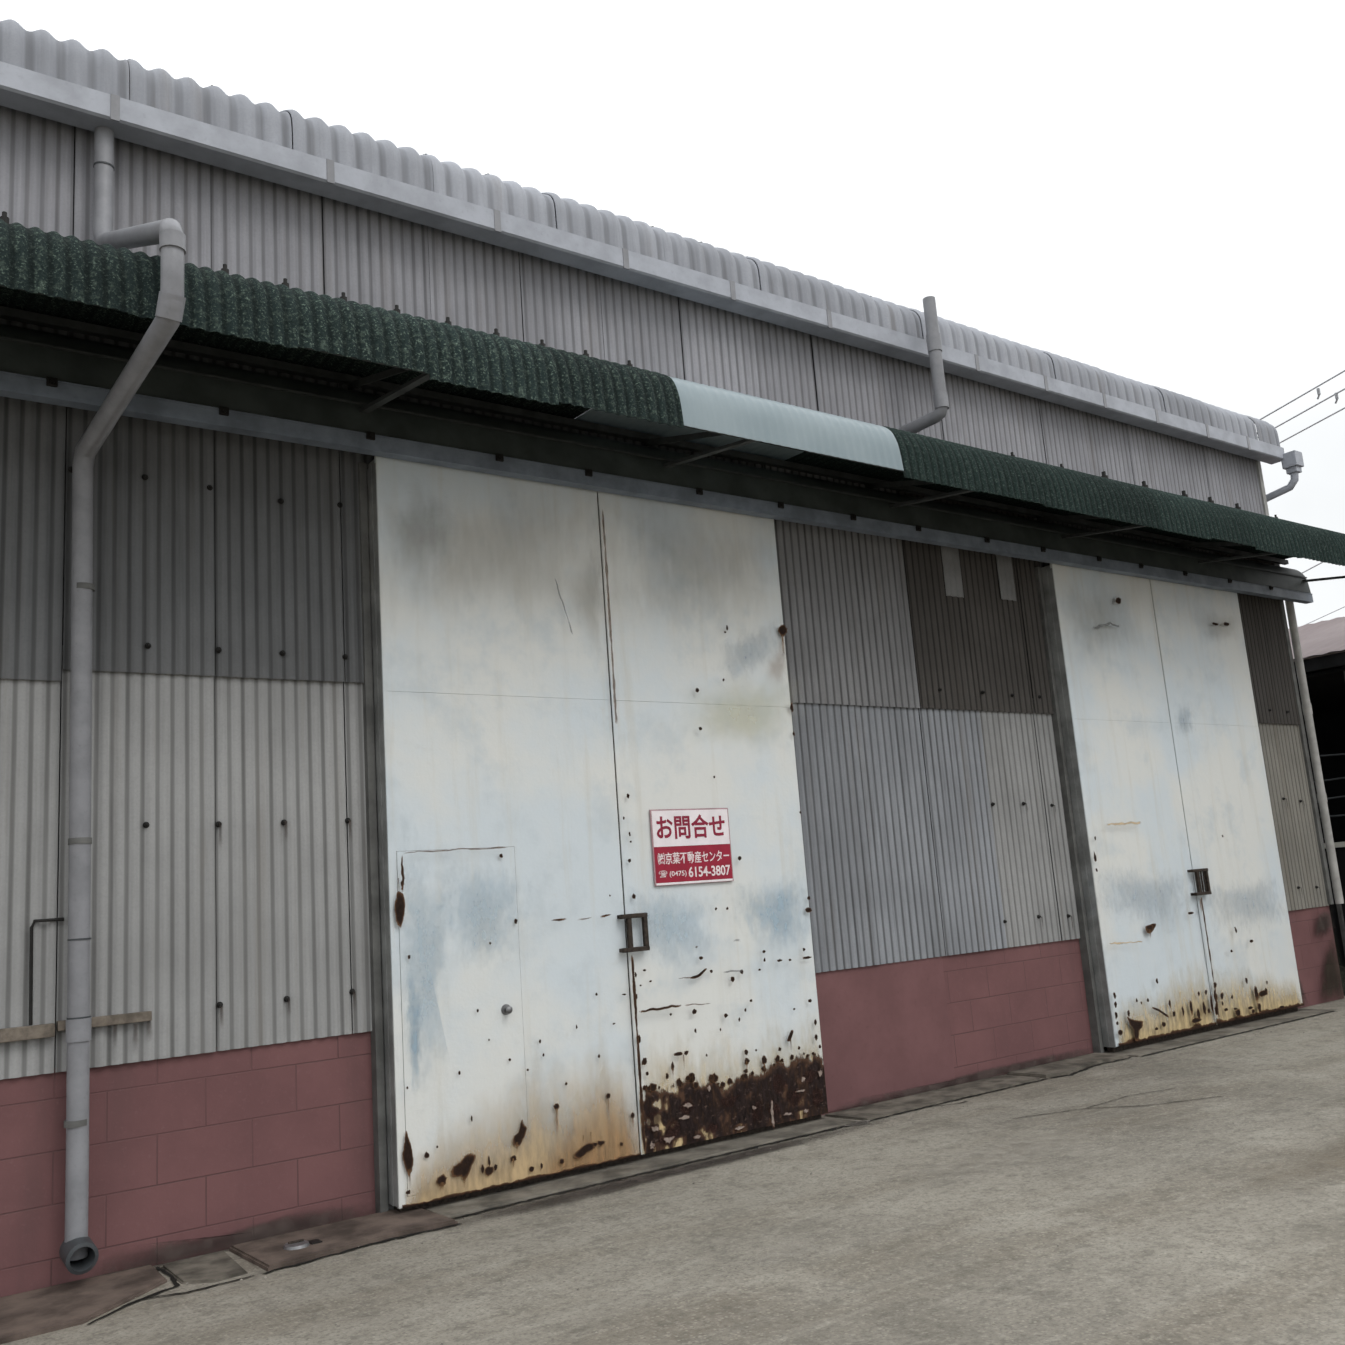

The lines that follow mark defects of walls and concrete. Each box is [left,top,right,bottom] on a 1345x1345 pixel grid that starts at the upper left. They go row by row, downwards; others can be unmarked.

rust [395,847,506,928]
rust [1113,897,1301,1043]
rust [402,956,828,1209]